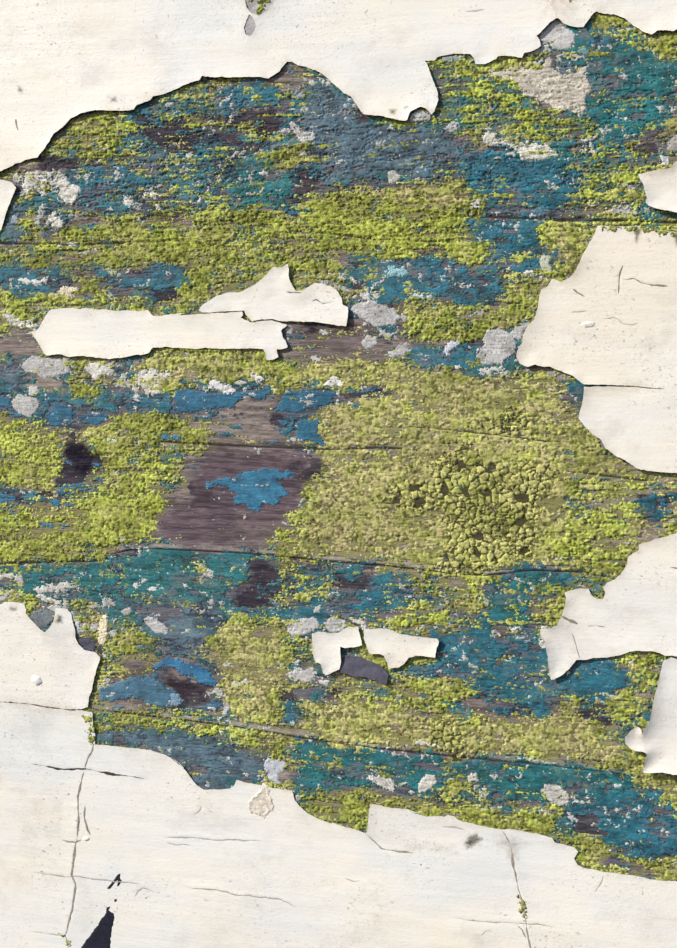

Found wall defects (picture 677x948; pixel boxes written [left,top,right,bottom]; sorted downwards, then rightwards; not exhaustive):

peeling [0,0,677,231]
peeling [0,416,202,549]
peeling [31,264,348,367]
peeling [193,411,244,437]
peeling [179,370,285,392]
peeling [302,371,381,398]
peeling [365,324,410,339]
peeling [505,161,677,521]
peeling [540,533,677,775]
crack [32,709,626,948]
peeling [0,594,677,948]